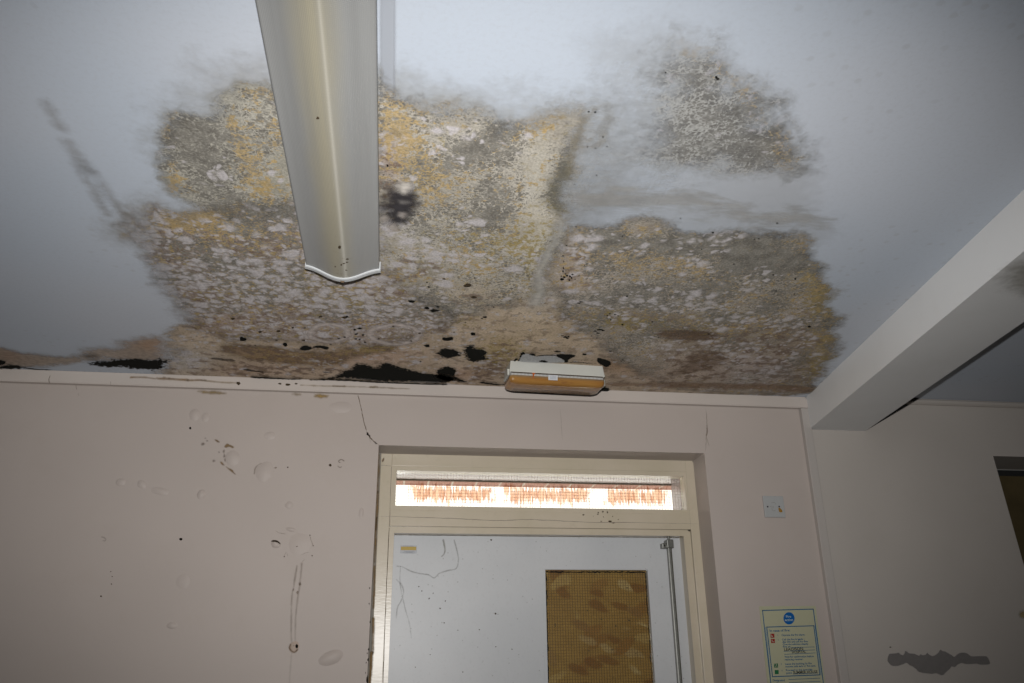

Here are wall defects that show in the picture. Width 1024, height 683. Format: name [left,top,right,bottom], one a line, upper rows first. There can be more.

damp [0,82,843,396]
mould [661,60,804,172]
crack [358,397,640,681]
peeling [887,647,990,676]